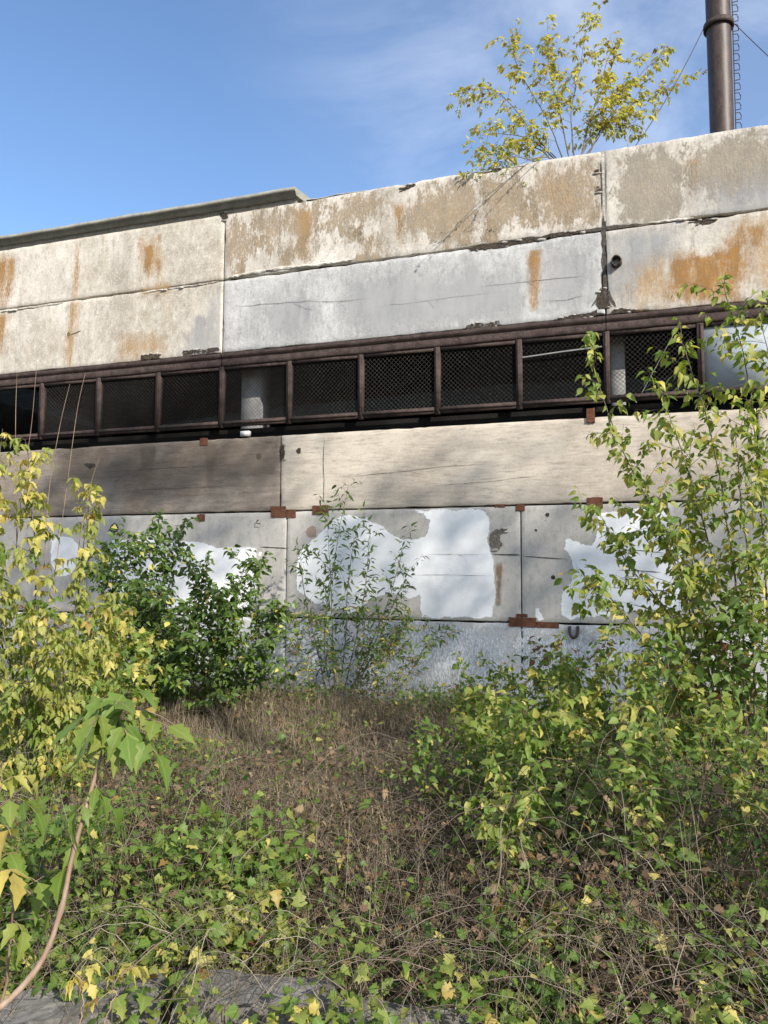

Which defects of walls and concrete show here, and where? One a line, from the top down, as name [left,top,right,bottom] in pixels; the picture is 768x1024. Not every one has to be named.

rust [0,259,14,297]
rust [144,235,166,292]
rust [529,251,540,309]
rust [638,222,768,305]
spalling [489,527,508,552]